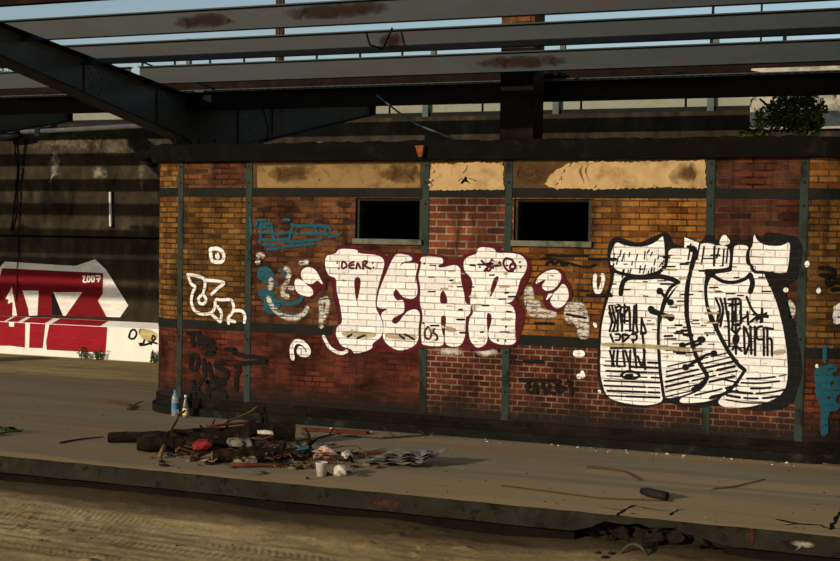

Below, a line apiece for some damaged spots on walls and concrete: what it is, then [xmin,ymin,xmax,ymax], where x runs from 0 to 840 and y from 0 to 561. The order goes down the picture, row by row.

rust [295,2,383,18]
peeling [428,162,505,191]
peeling [544,159,707,190]
crack [776,496,840,530]